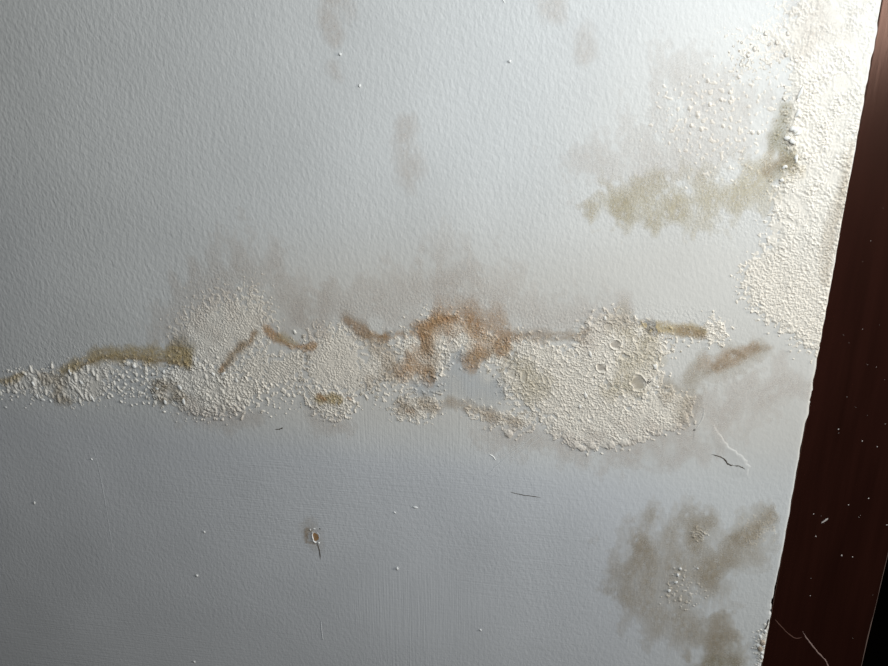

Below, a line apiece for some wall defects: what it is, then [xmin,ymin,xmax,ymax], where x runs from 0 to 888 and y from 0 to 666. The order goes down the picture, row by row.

damp [642,323,706,337]
damp [54,347,189,401]